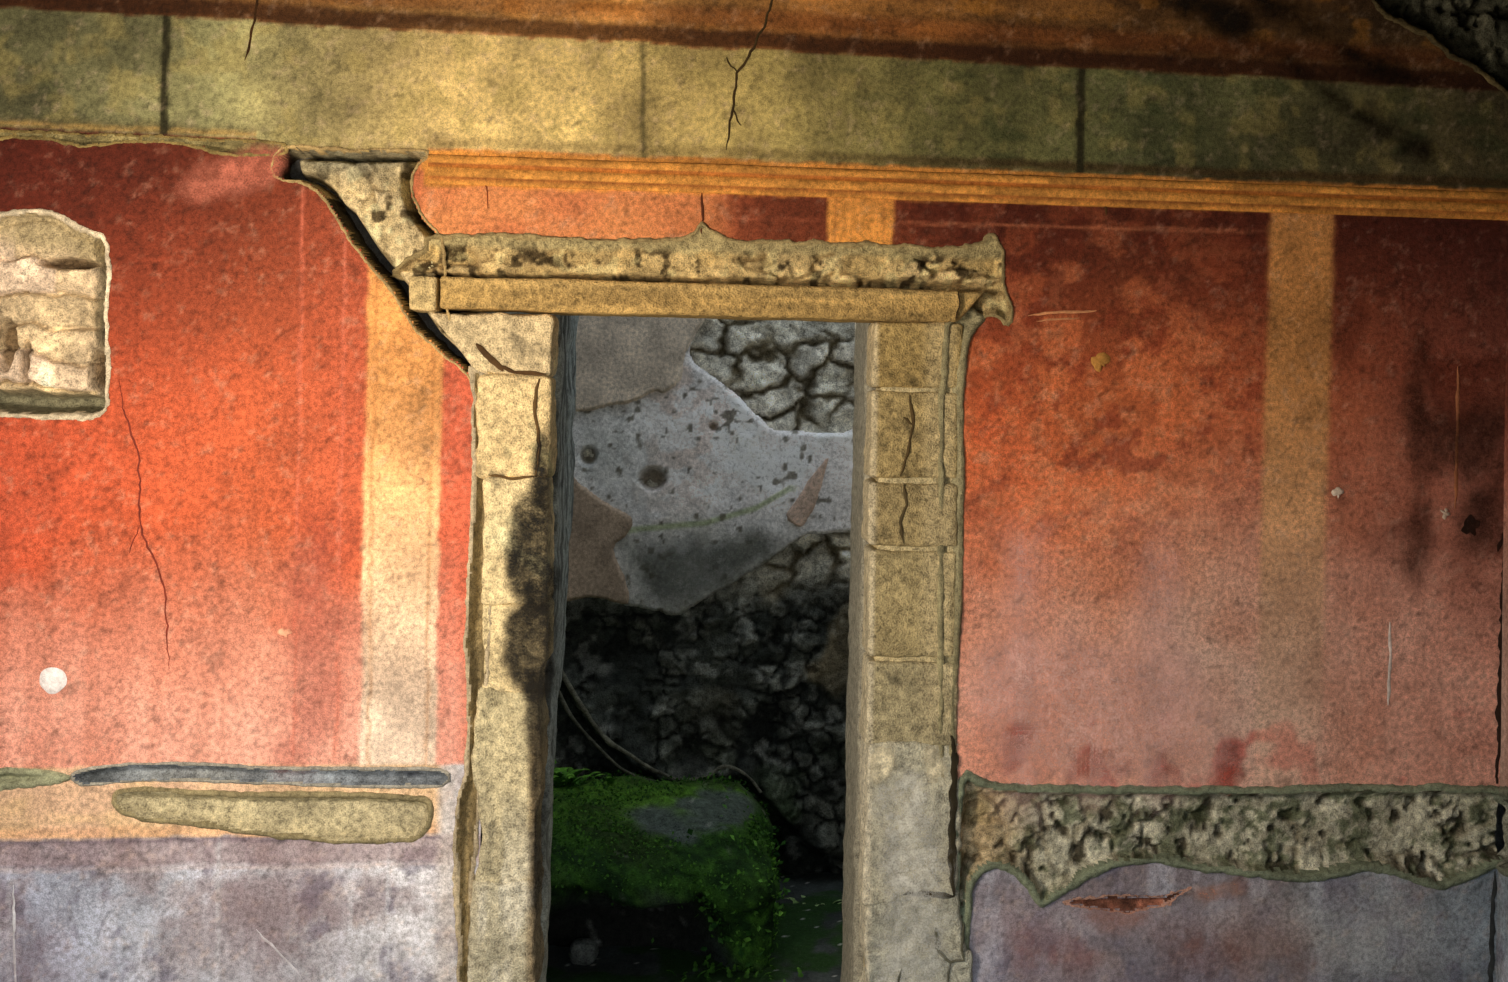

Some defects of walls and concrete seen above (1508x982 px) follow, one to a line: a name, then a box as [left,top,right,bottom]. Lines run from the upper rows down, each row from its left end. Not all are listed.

crack [726,0,773,149]
flaking render [1372,0,1508,99]
flaking render [0,128,1014,421]
crack [899,395,915,543]
flaking render [0,767,70,791]
crack [903,735,965,982]
rust [1062,886,1215,914]
flaking render [955,769,1508,950]